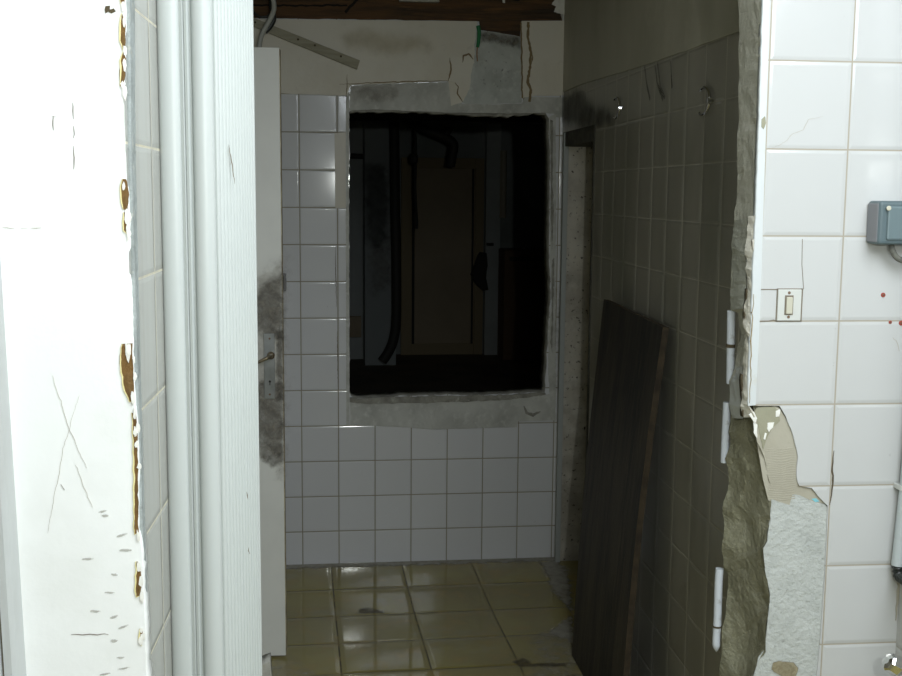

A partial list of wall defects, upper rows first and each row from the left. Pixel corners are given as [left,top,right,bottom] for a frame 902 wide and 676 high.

flaking render [463,31,522,104]
crack [520,22,533,102]
spalling [719,216,827,676]